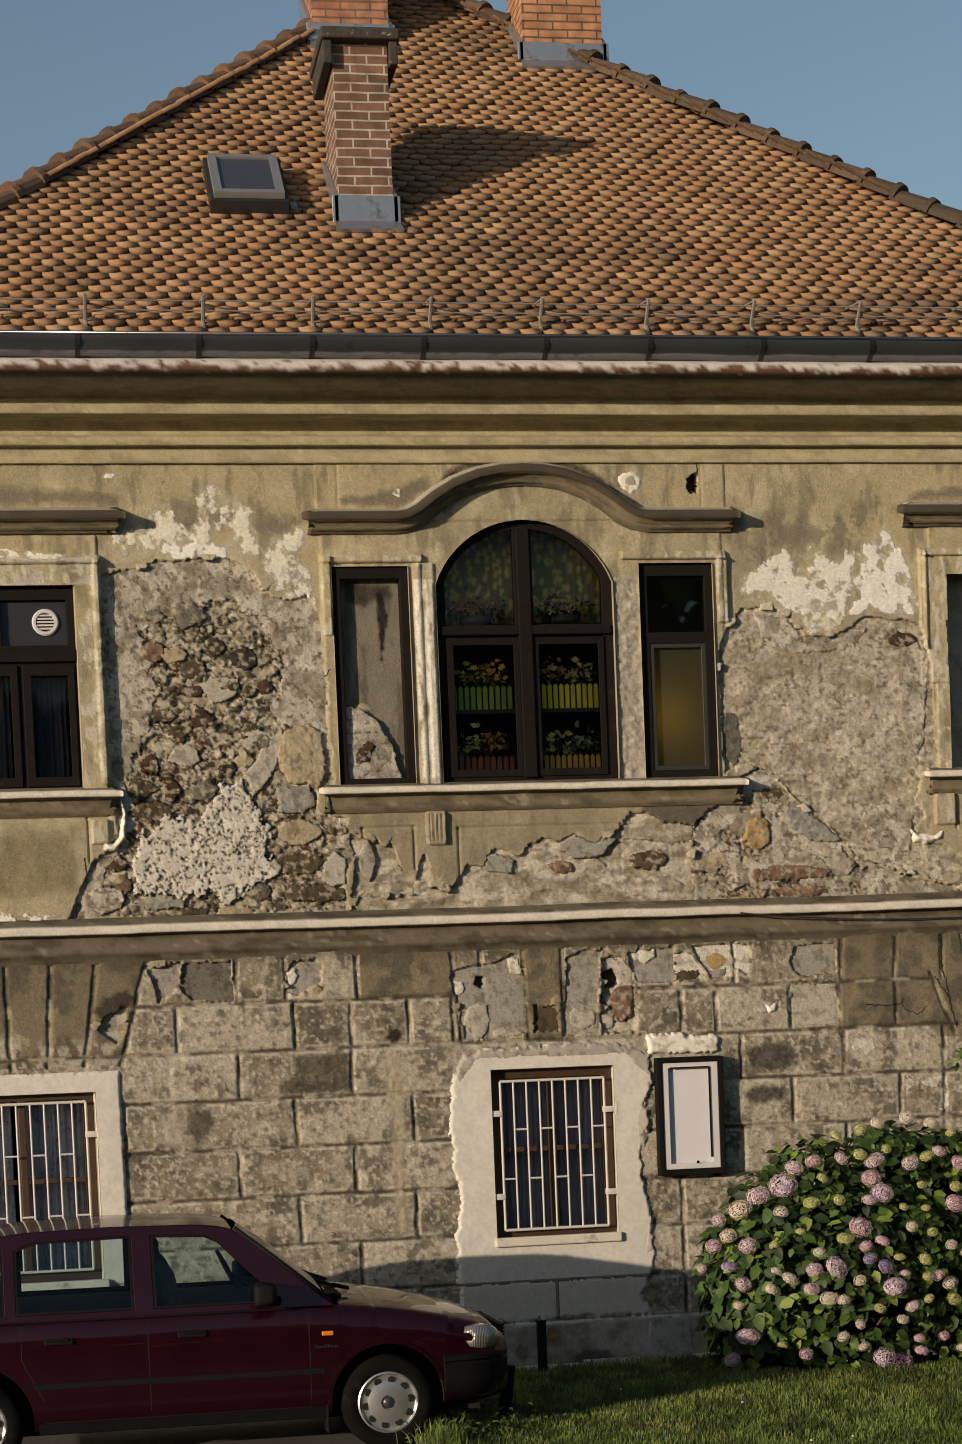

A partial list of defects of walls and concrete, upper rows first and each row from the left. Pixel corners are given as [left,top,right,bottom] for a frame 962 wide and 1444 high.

spalling [70,485,962,919]
peeling [0,912,50,922]
spalling [449,943,751,1041]